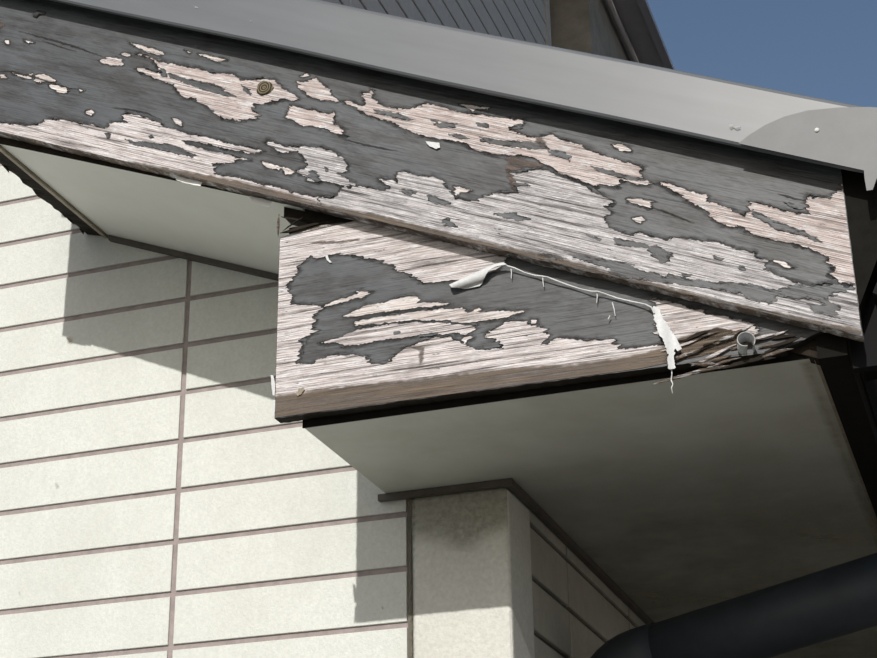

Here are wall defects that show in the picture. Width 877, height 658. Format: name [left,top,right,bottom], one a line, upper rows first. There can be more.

peeling [0,41,862,397]